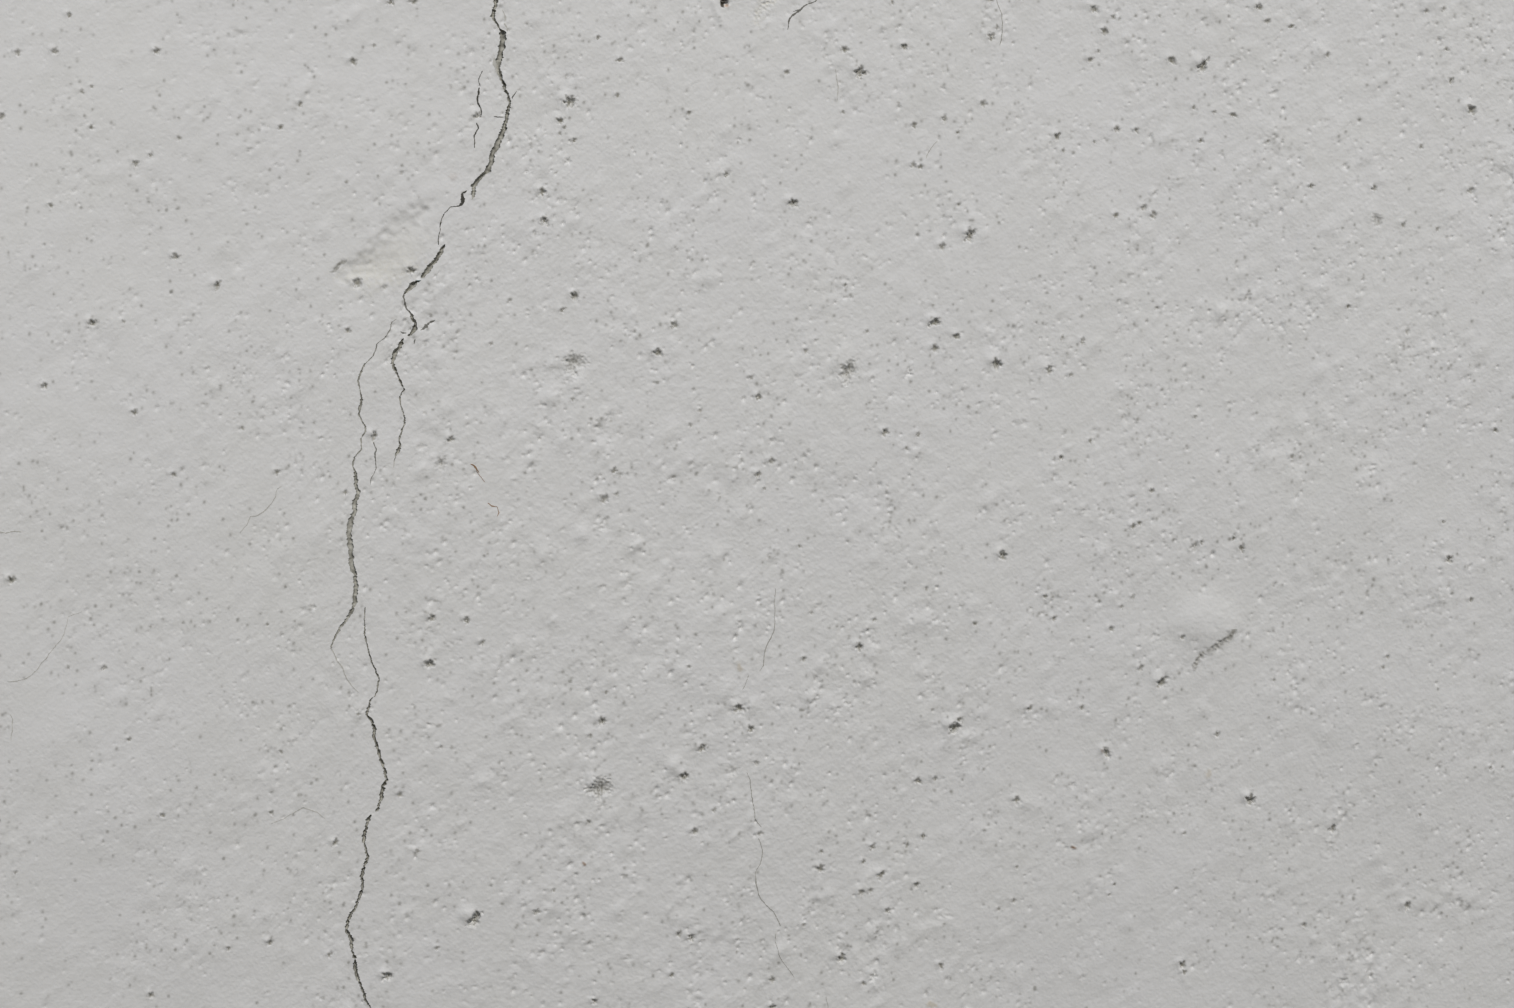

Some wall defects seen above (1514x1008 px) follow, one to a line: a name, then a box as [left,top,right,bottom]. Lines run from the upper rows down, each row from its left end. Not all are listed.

crack [330,0,517,1008]